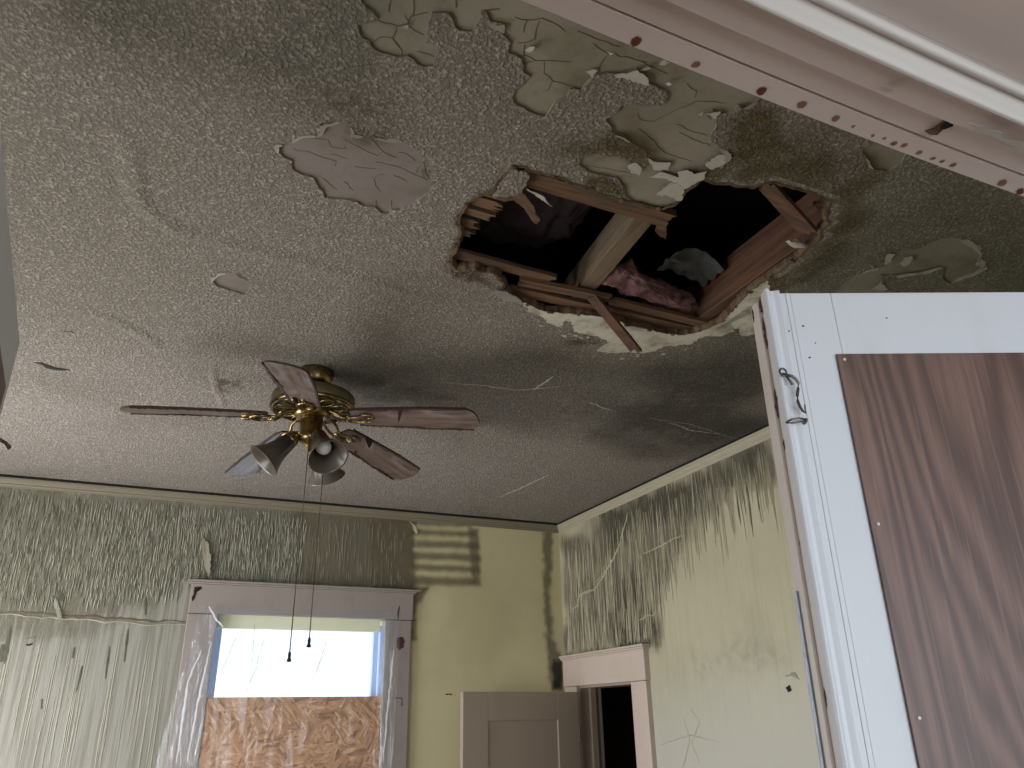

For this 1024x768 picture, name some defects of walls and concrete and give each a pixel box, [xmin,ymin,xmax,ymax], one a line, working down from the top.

peeling [358,0,759,207]
peeling [488,281,770,360]
peeling [834,238,987,293]
crack [0,423,769,620]
crack [0,582,209,691]
peeling [0,487,405,768]